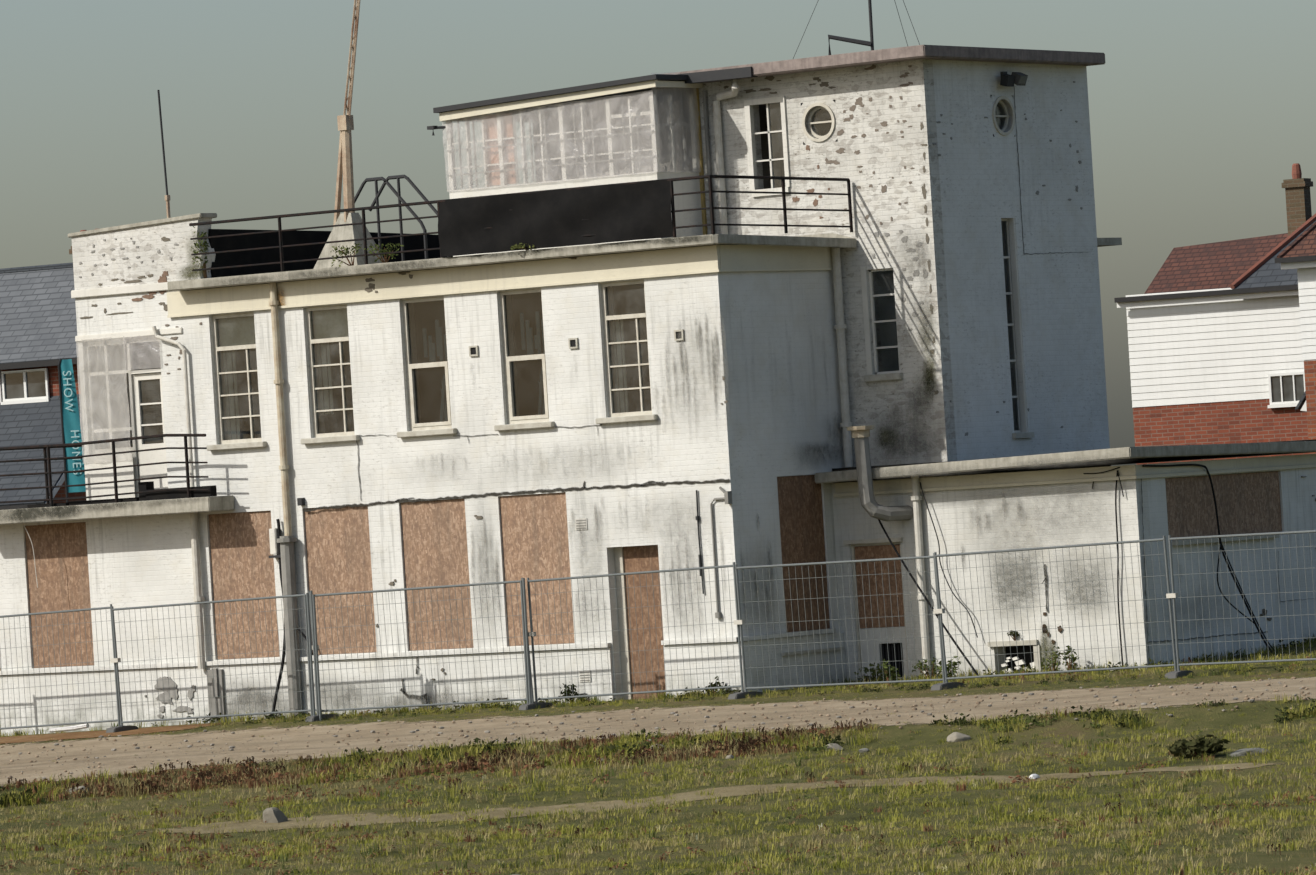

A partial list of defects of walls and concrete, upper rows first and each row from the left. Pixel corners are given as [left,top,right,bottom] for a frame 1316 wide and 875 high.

peeling [792,188,830,219]
peeling [817,65,953,354]
flaking render [79,237,182,374]